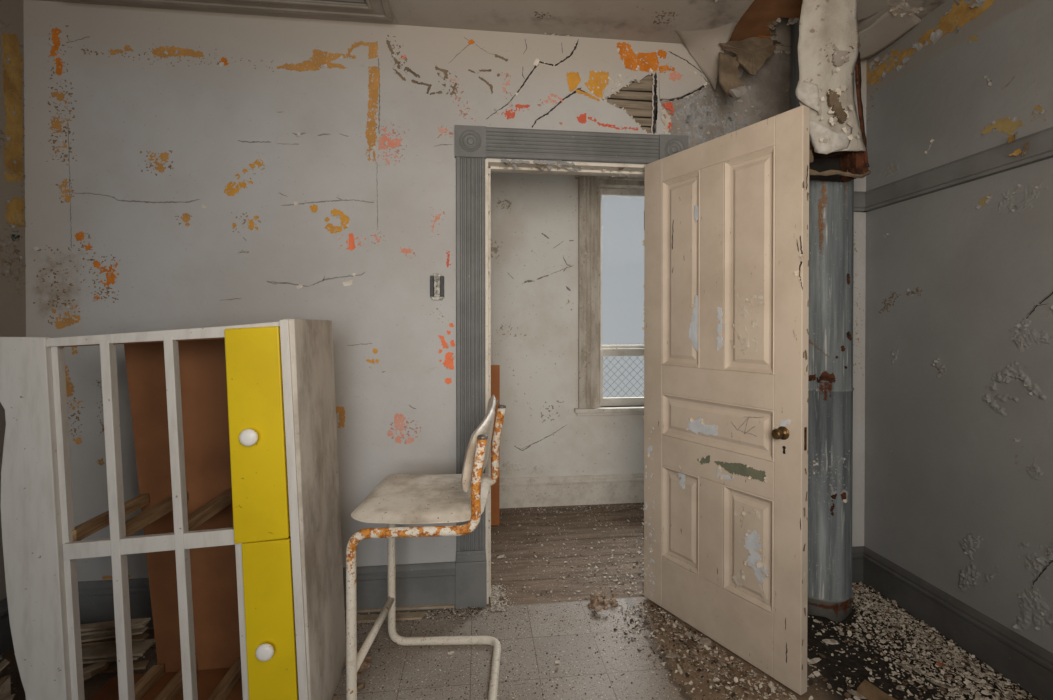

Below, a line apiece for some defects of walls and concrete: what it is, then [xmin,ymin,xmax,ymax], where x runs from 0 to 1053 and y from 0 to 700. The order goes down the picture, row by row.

peeling [46,25,683,166]
crack [486,33,579,120]
crack [531,88,585,128]
crack [651,51,709,134]
flaking render [660,0,803,148]
peeling [818,85,860,143]
peeling [0,33,120,329]
crack [67,125,199,249]
peeling [224,159,265,196]
peeling [294,201,385,251]
crack [267,272,366,287]
rust [808,331,852,400]